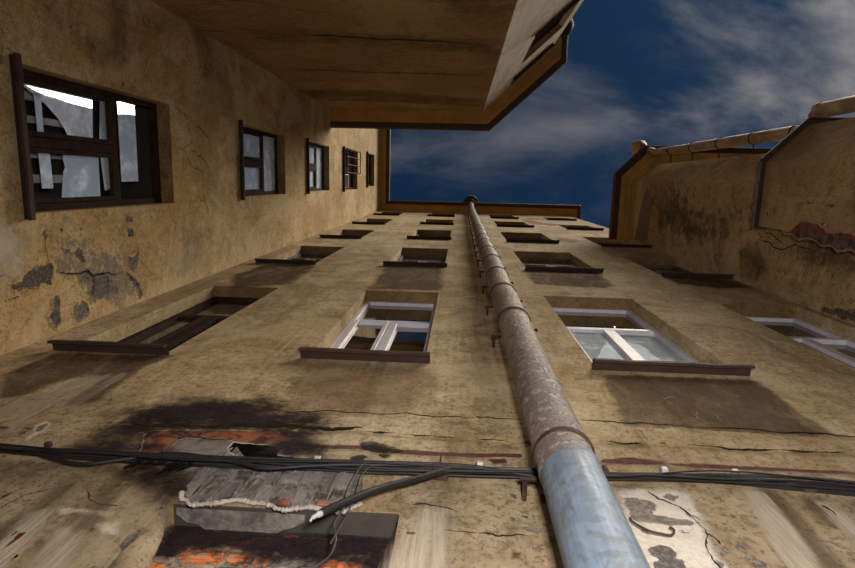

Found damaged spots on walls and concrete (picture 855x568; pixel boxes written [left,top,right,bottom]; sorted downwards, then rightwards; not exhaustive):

crack [748,205,817,251]
flaking render [782,220,855,253]
flaking render [5,215,143,331]
flaking render [138,429,300,458]
flaking render [624,497,700,534]
crack [648,491,721,568]
flaking render [648,545,686,568]
flaking render [716,543,766,568]